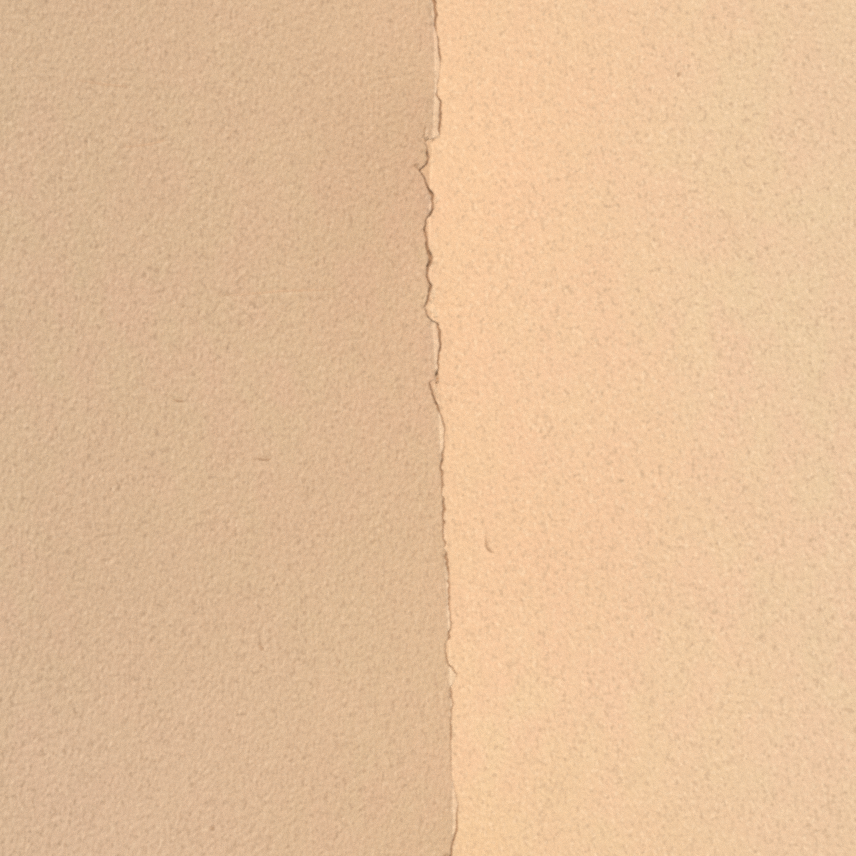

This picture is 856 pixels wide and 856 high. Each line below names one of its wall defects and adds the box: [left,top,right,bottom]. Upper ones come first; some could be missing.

crack [416,0,458,856]